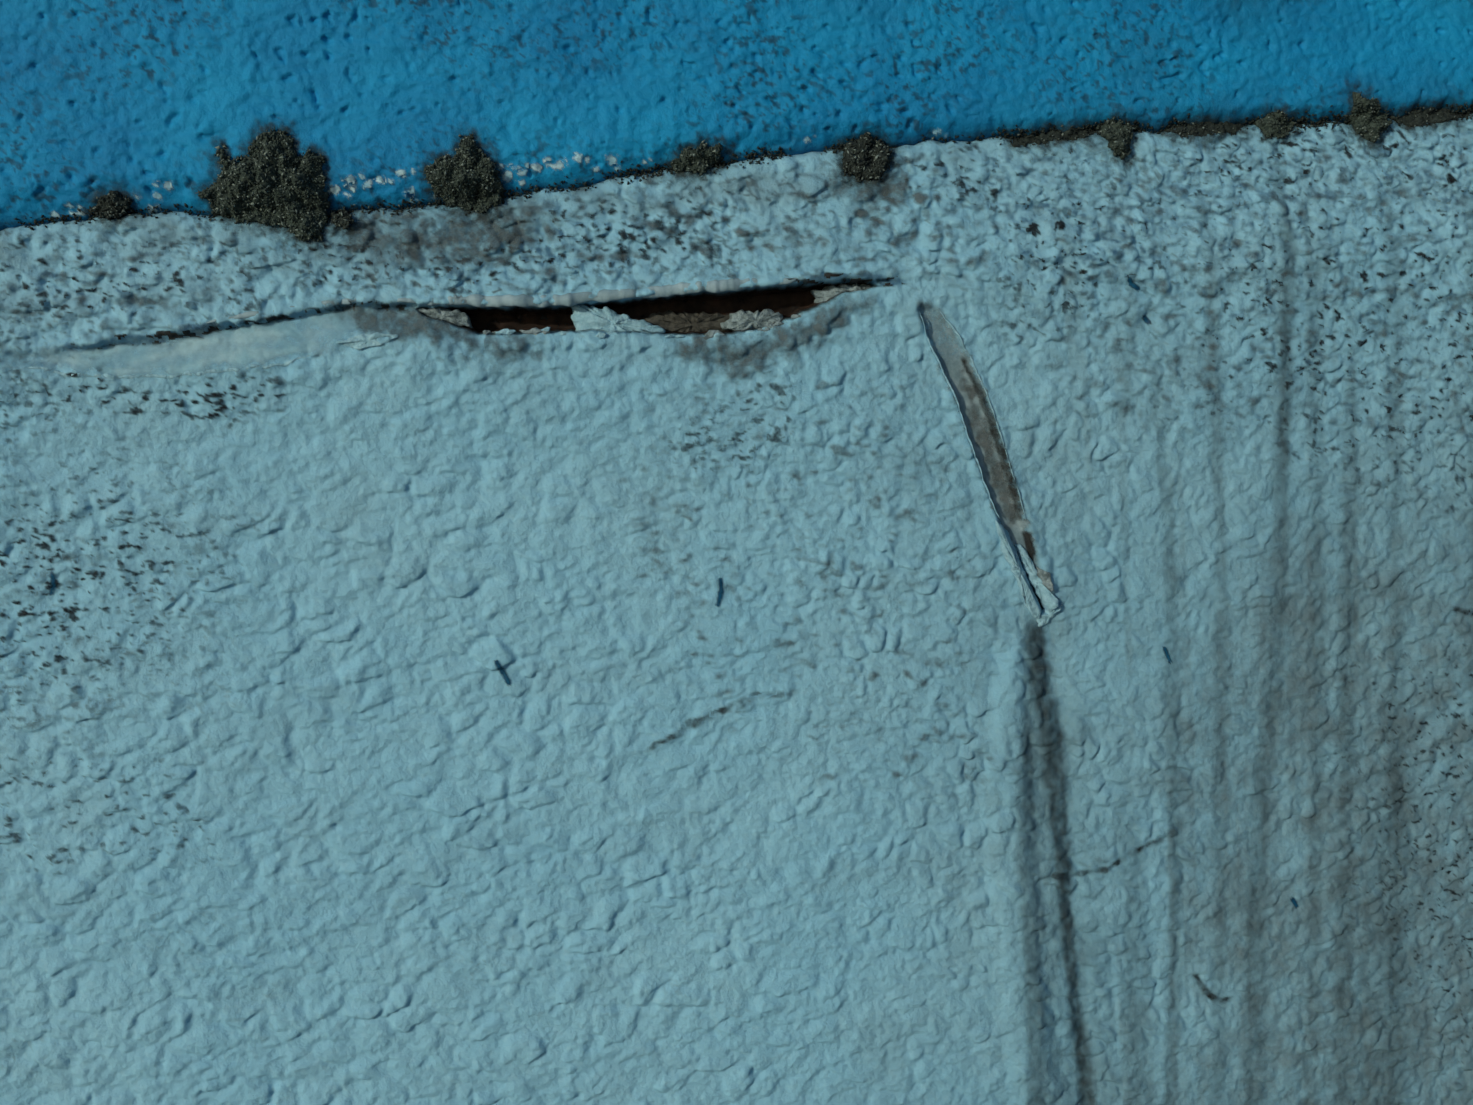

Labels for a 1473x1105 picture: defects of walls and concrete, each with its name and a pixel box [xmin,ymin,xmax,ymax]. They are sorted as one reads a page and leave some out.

leakage [1178,127,1354,197]
leakage [1383,126,1412,154]
leakage [298,221,404,287]
crack [71,272,904,349]
leakage [434,187,719,297]
leakage [905,147,1116,329]
leakage [1198,134,1473,458]
spalling [919,304,1063,627]
leakage [1030,627,1077,987]
leakage [1074,1009,1094,1104]